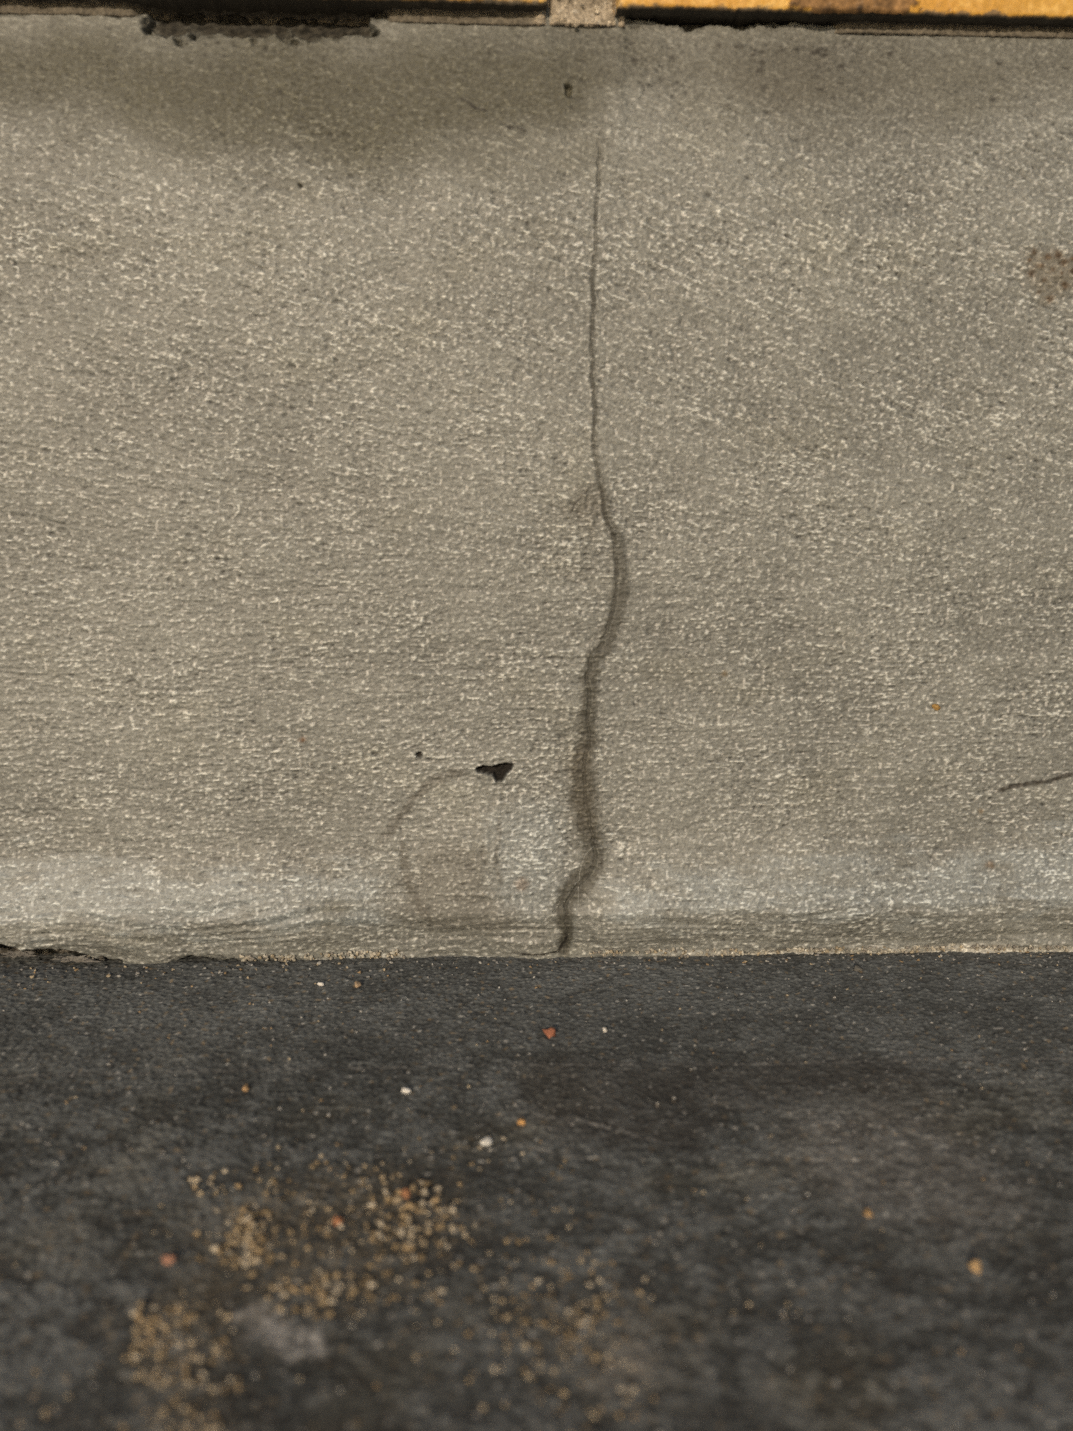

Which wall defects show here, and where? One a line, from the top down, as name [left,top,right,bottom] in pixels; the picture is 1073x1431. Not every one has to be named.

spalling [618,0,921,91]
crack [511,148,618,958]